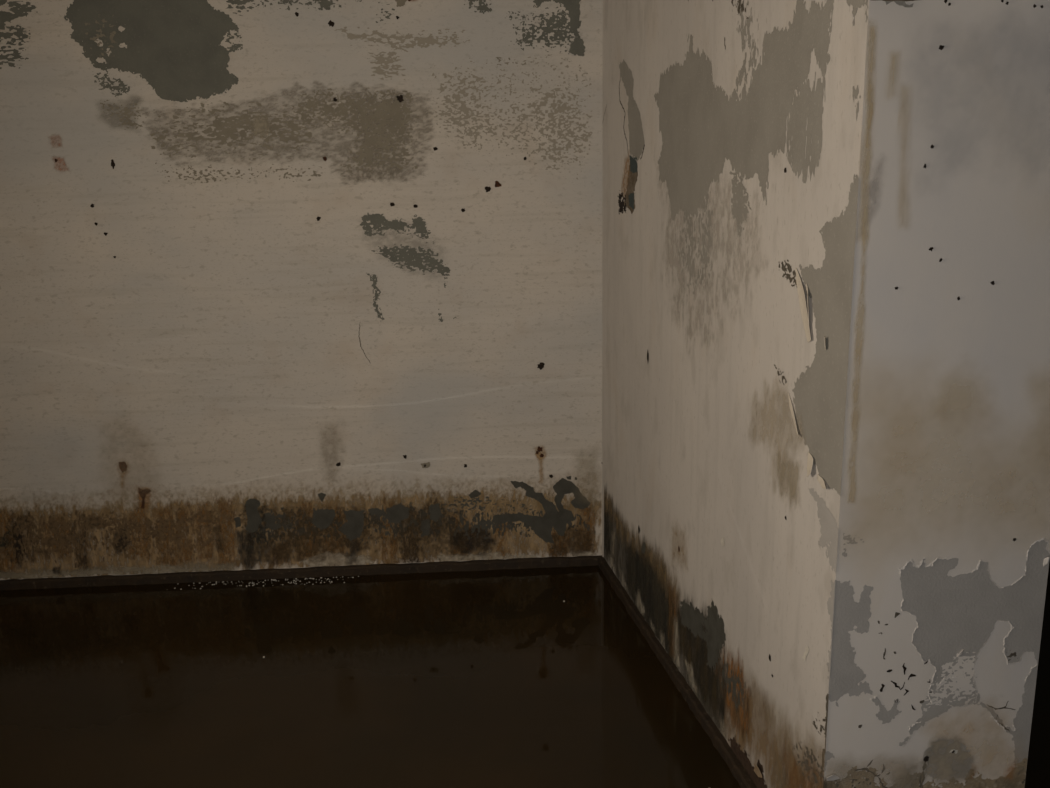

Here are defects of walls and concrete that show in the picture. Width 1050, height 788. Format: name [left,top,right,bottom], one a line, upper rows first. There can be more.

peeling [0,0,38,69]
peeling [64,0,607,184]
peeling [618,59,645,214]
peeling [654,0,868,300]
peeling [360,202,450,288]
peeling [367,273,384,320]
damp [0,496,544,579]
corrosion [0,488,602,580]
damp [551,495,727,737]